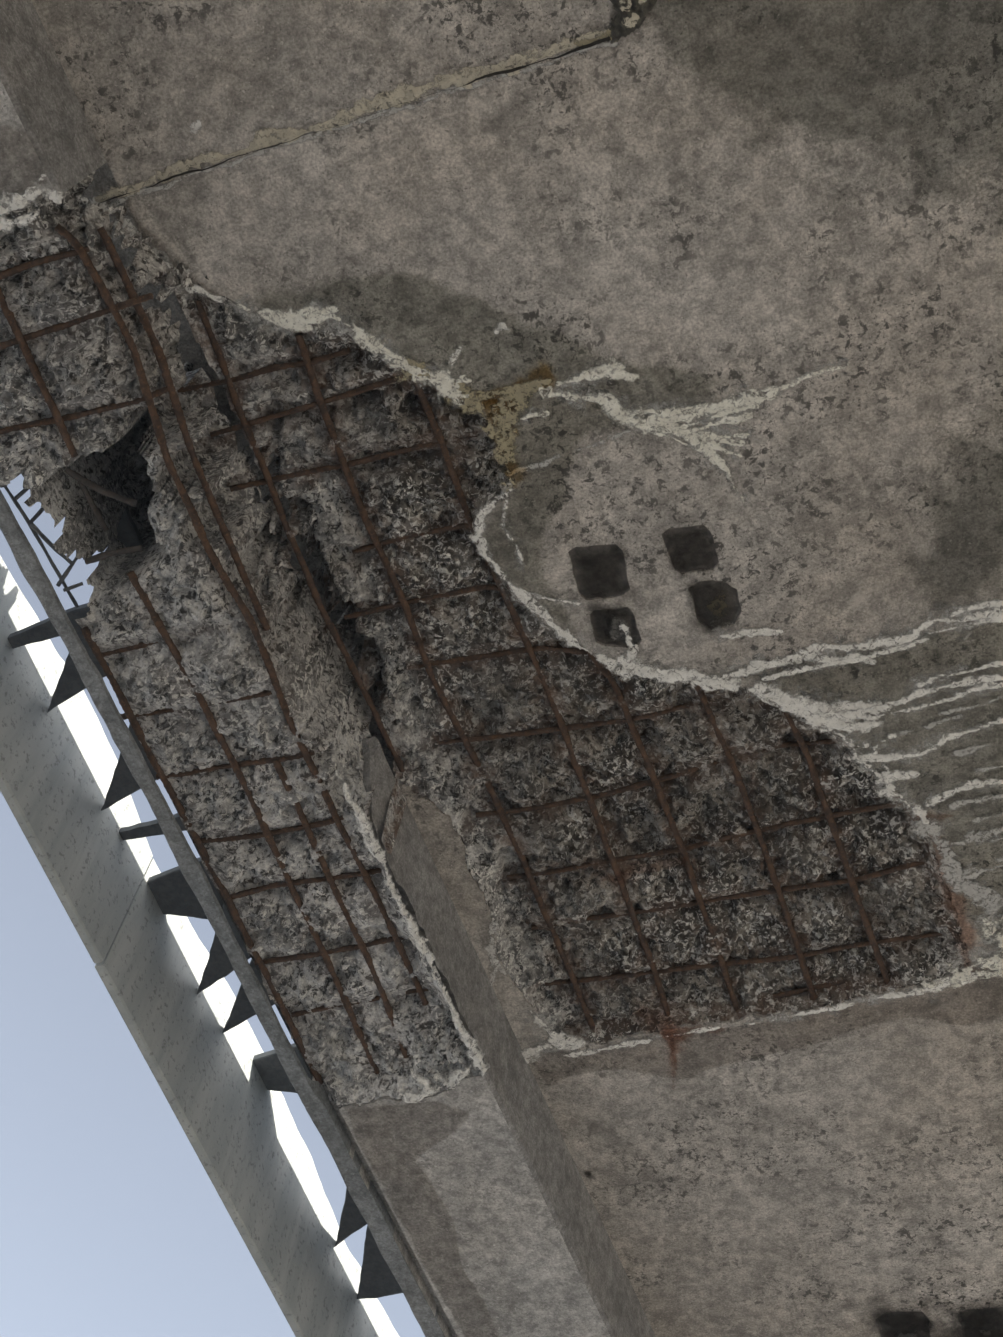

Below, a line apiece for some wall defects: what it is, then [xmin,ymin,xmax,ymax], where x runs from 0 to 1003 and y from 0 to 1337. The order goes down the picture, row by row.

leakage [0,174,63,231]
crack [100,37,611,203]
spalling [0,171,969,1108]
leakage [178,285,1003,1025]